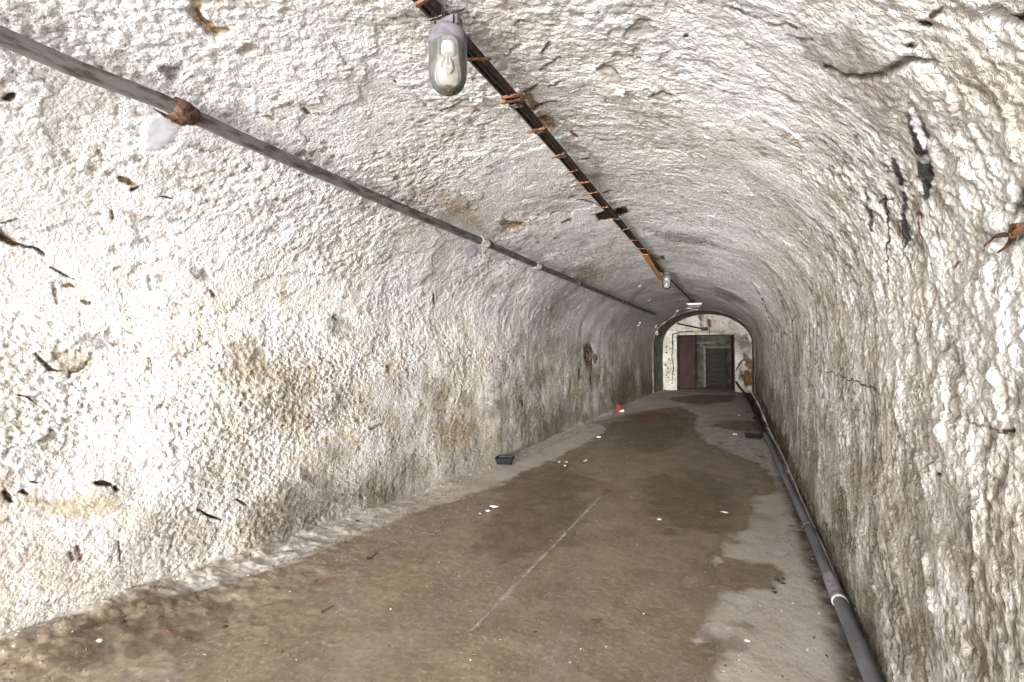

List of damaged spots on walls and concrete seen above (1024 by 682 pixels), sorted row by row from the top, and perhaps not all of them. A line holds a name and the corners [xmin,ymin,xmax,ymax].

crack [824,56,937,80]
rust [523,84,557,131]
leakage [906,107,937,200]
leakage [865,192,874,232]
leakage [892,159,911,245]
crack [824,371,880,395]